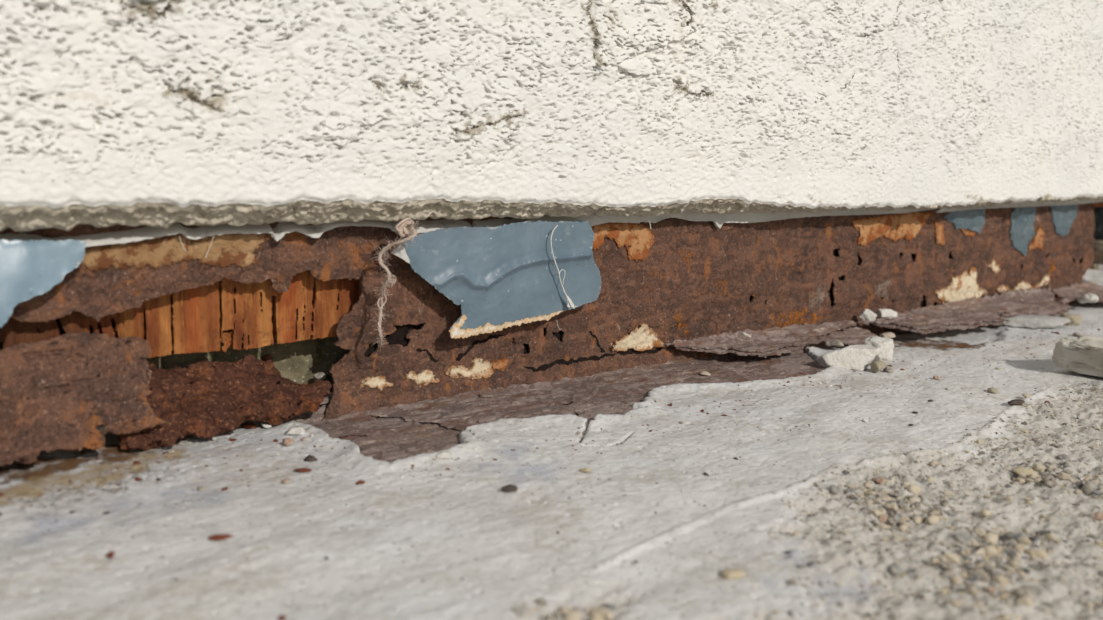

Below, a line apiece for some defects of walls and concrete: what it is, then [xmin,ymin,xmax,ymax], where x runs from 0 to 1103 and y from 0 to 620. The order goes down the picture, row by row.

crack [110,0,183,22]
crack [676,0,718,21]
crack [582,0,606,66]
crack [165,84,221,111]
peeling [0,196,1103,339]
corrosion [893,338,985,350]
peeling [281,454,317,484]
peeling [501,484,518,492]